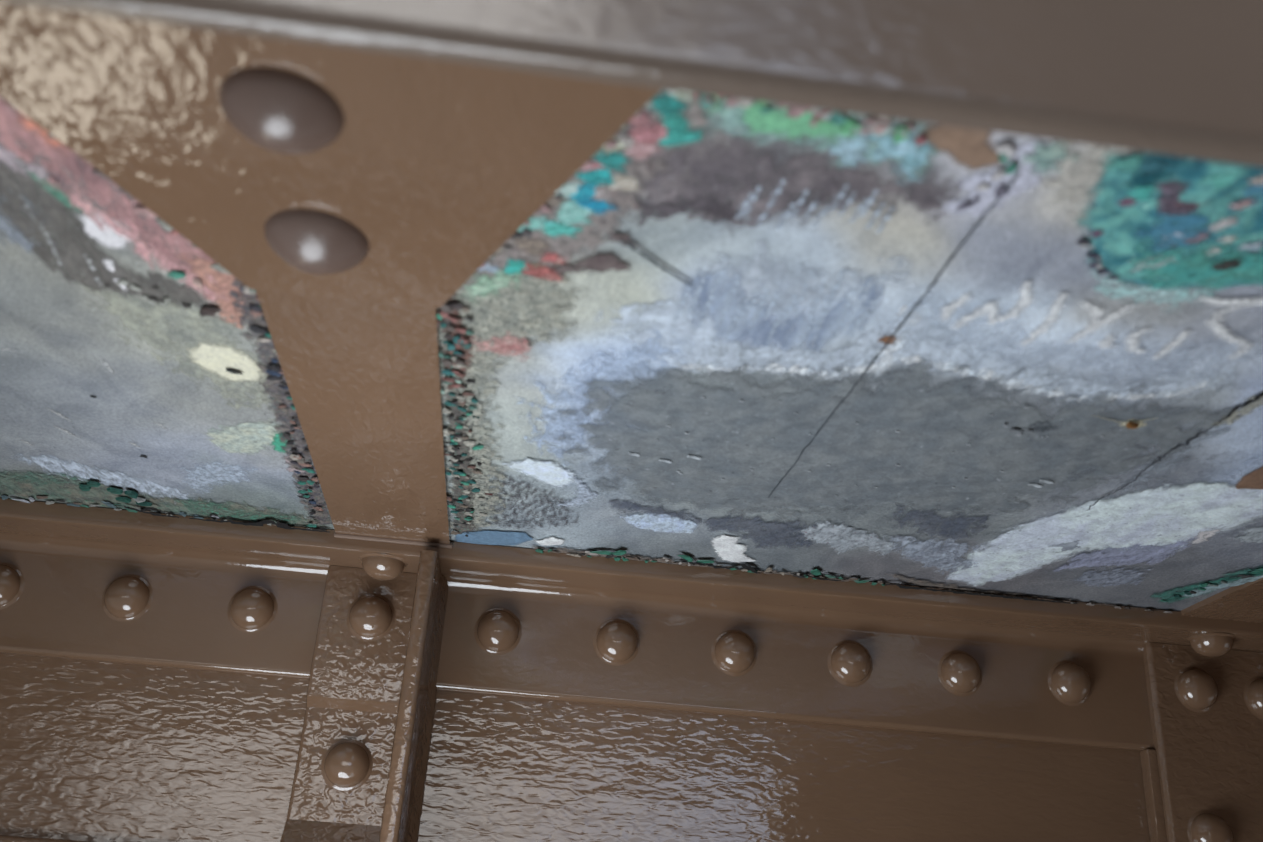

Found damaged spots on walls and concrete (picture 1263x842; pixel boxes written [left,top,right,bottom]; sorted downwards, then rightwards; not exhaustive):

crack [1086,393,1263,511]